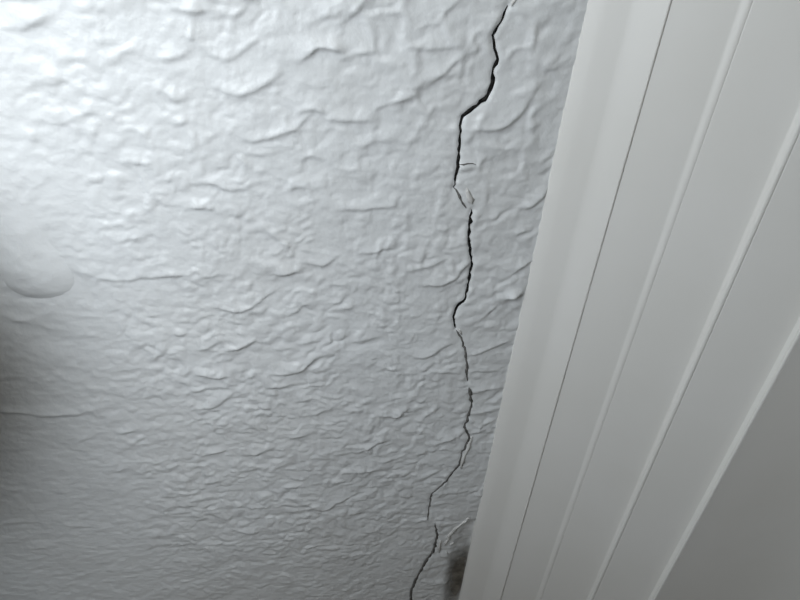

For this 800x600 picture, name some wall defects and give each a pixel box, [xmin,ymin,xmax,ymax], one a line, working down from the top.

crack [409,0,516,600]